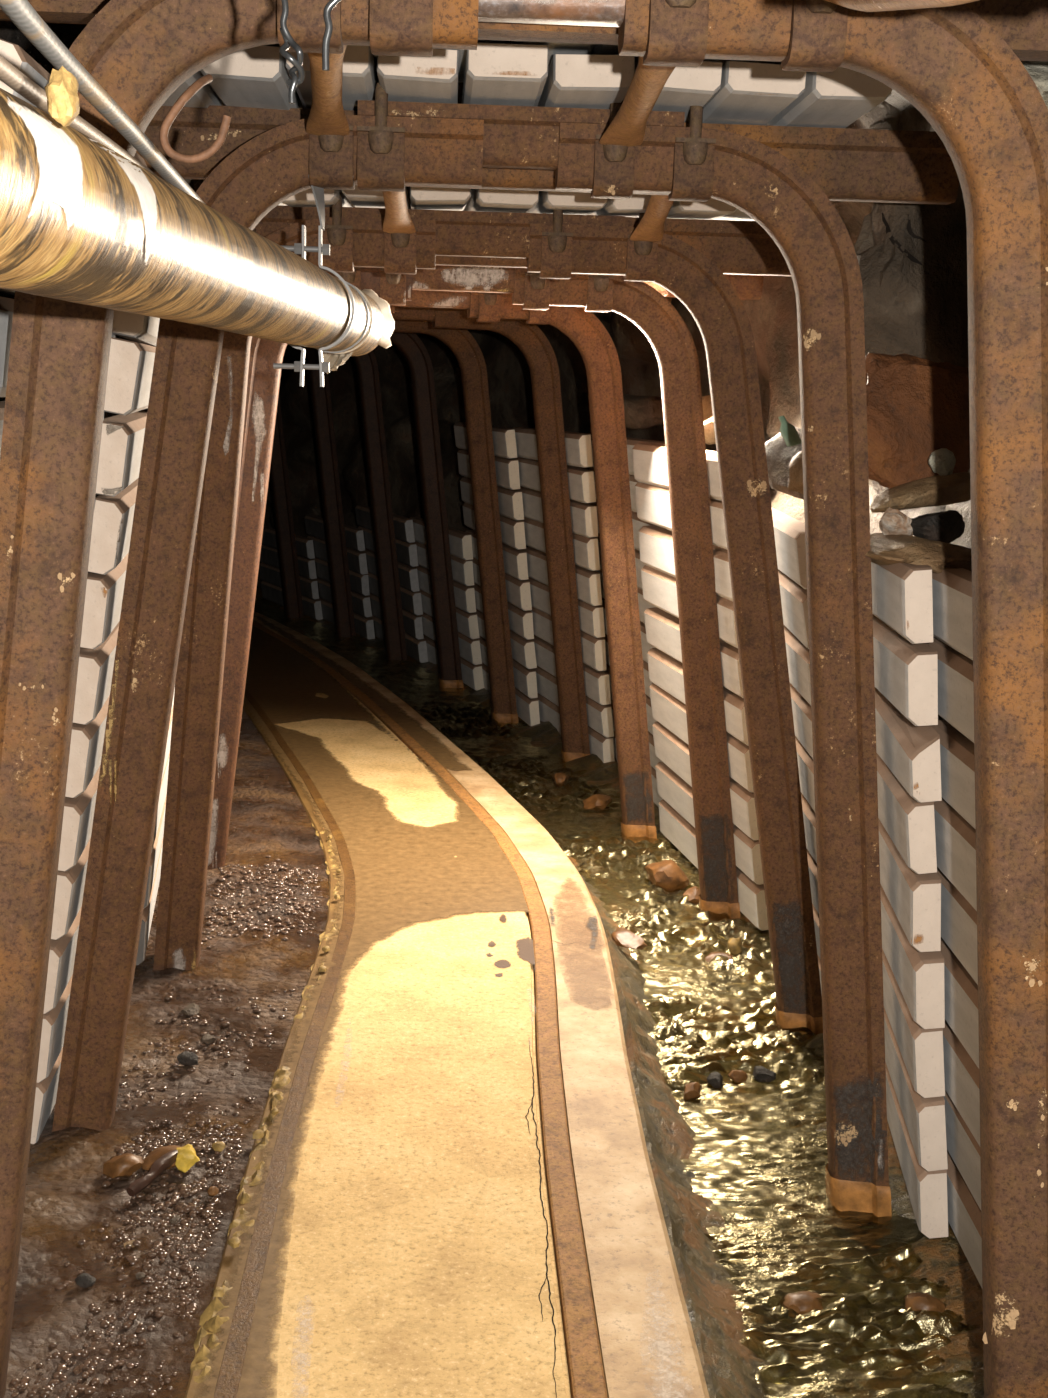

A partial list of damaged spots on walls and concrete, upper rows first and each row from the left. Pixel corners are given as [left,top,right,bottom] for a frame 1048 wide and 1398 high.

rust [803,329,821,351]
damp [175,951,196,970]
damp [557,879,611,1009]
rust [1023,956,1043,987]
damp [197,616,535,1398]
rust [834,1122,858,1147]
crack [525,1044,557,1398]
rust [982,1293,1019,1344]